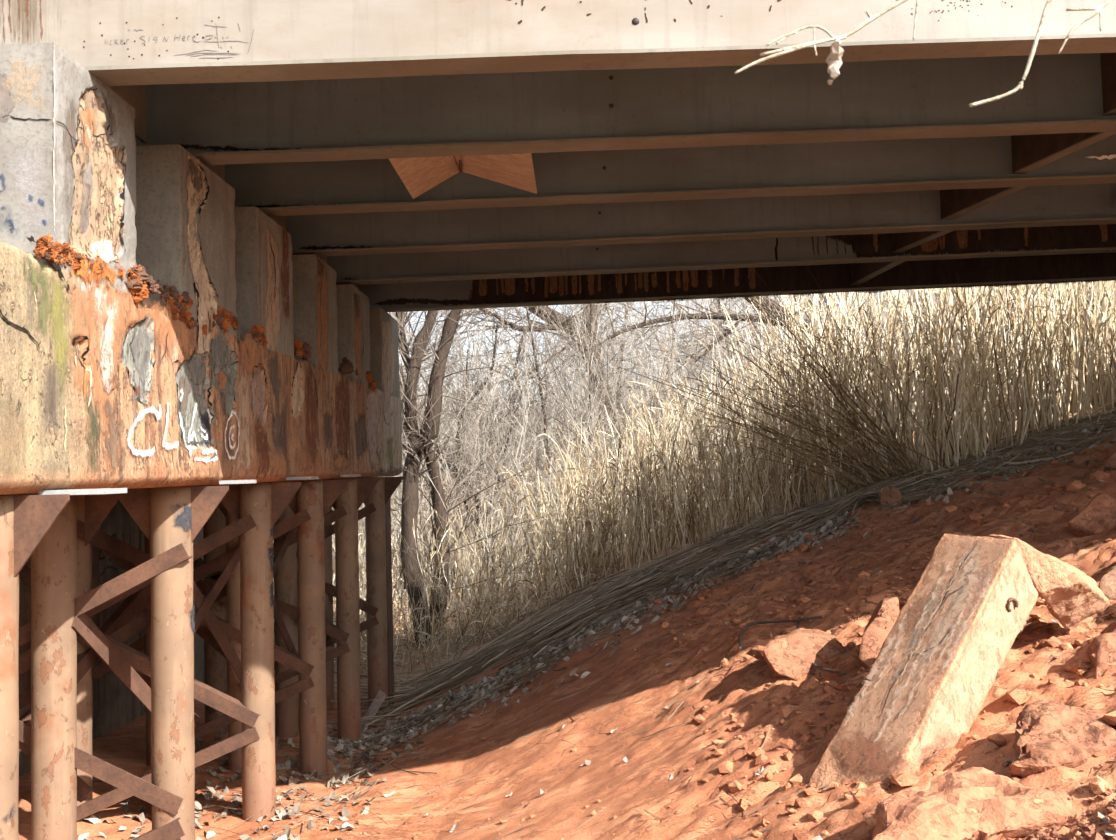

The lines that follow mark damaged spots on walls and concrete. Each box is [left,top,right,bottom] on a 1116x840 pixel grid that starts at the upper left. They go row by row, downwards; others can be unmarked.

crack [1,115,111,152]
spalling [69,88,126,264]
crack [0,309,41,351]
rust [27,233,197,472]
spalling [72,314,156,481]
spalling [175,153,240,451]
rust [212,306,268,348]